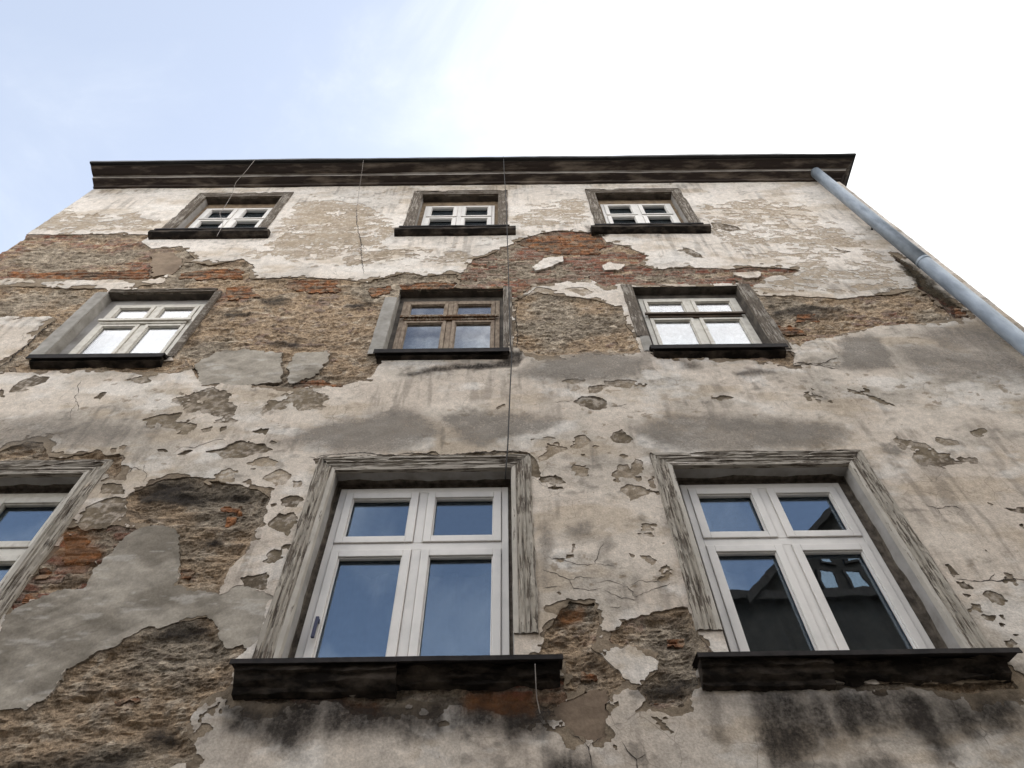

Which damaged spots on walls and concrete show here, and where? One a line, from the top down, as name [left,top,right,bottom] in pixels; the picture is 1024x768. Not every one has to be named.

spalling [0,198,975,435]
water stain [291,410,436,451]
water stain [443,415,558,444]
water stain [641,415,842,450]
peeling [893,437,978,469]
spalling [0,429,304,615]
crack [544,545,670,608]
spalling [0,592,712,768]
water stain [909,701,954,760]